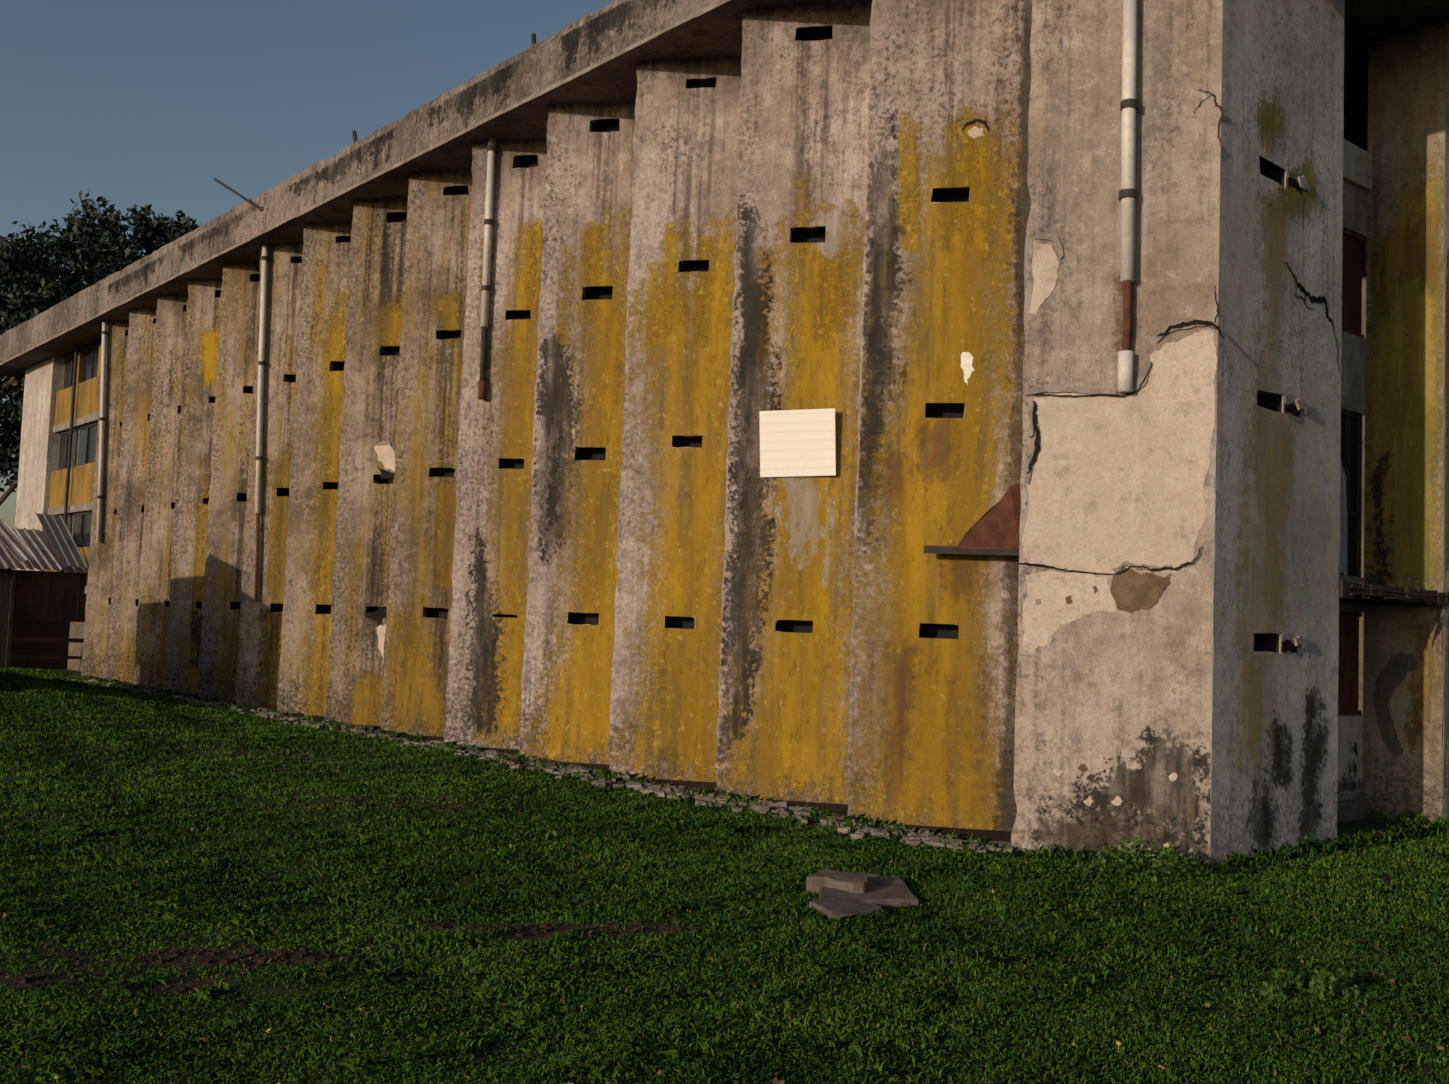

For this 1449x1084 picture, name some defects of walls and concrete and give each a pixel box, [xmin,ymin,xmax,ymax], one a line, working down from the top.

spalling [374,441,395,480]
water stain [720,194,835,754]
water stain [1007,0,1032,389]
flaking render [1030,232,1064,317]
flaking render [1022,317,1217,654]
crack [1025,286,1225,474]
crack [1194,89,1224,160]
crack [1284,261,1340,372]
water stain [434,479,505,736]
water stain [992,555,1019,832]
spalling [1083,796,1122,820]
water stain [1030,726,1211,863]